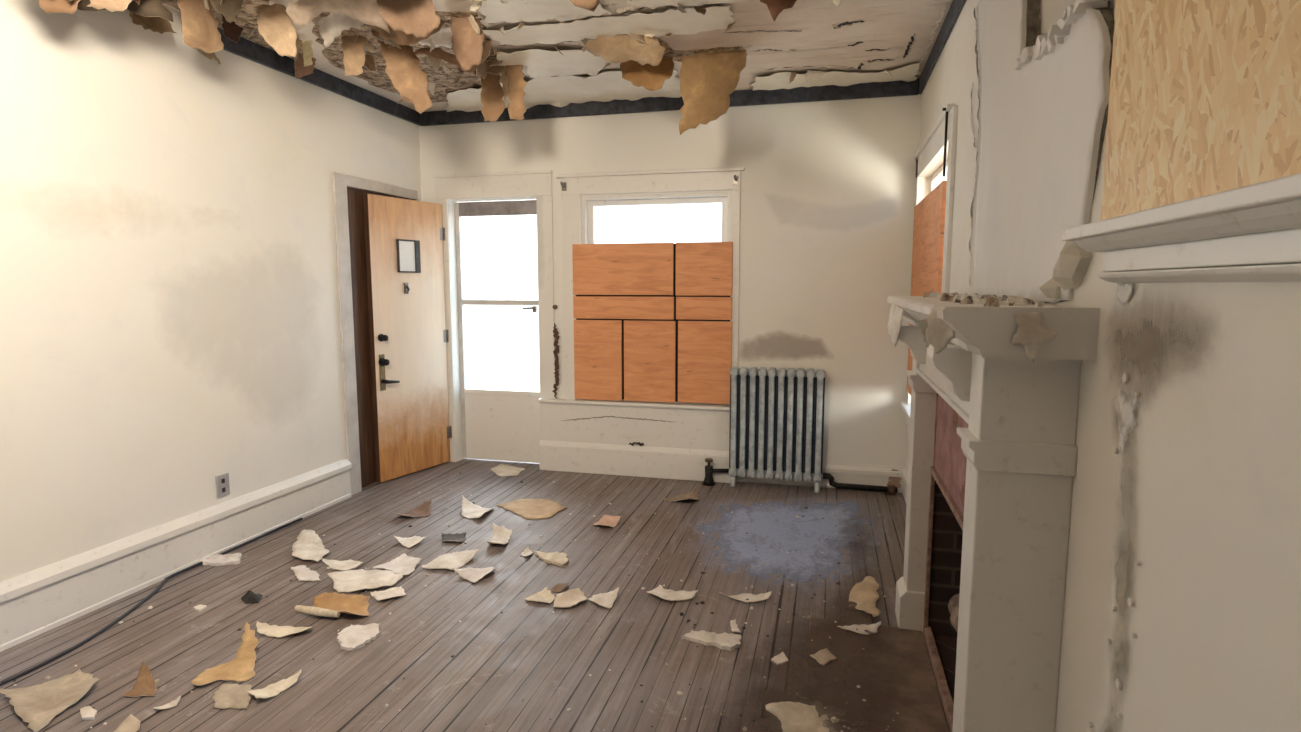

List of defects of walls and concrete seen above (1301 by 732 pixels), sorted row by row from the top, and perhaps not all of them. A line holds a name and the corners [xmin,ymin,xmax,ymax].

peeling [470,0,751,109]
crack [446,0,918,70]
peeling [751,0,949,90]
flaking render [1015,0,1108,70]
peeling [445,87,483,112]
crack [969,5,982,286]
damp [1114,316,1201,379]